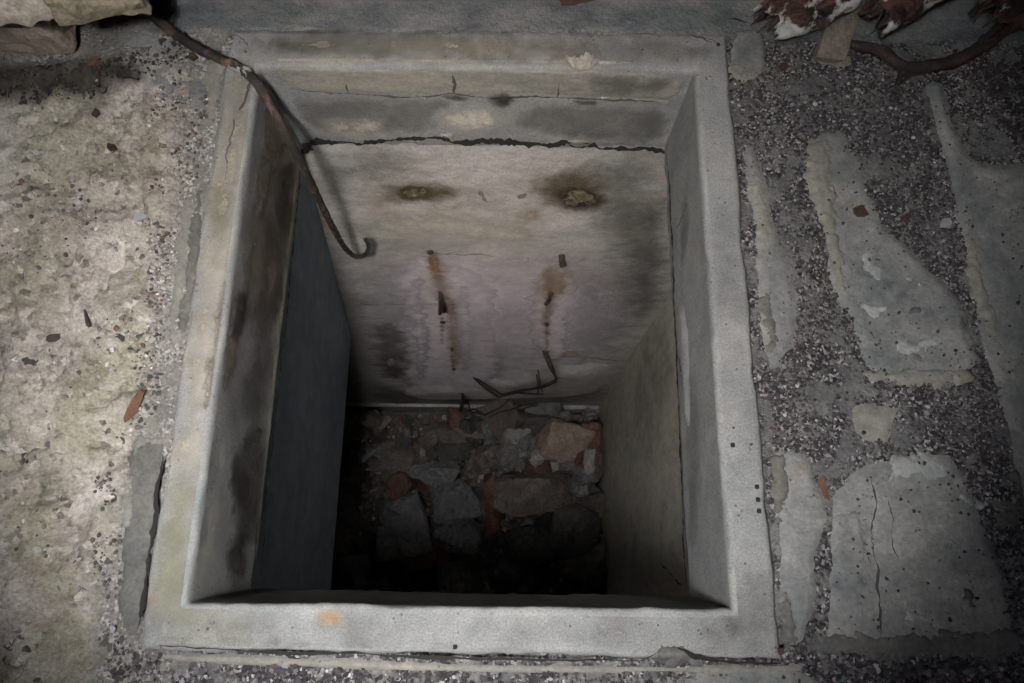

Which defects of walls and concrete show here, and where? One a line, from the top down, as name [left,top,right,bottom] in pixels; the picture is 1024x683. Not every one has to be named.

crack [297,74,661,103]
crack [260,133,688,588]
water stain [379,258,581,387]
crack [137,454,164,629]
water stain [227,433,262,592]
crack [870,481,899,640]